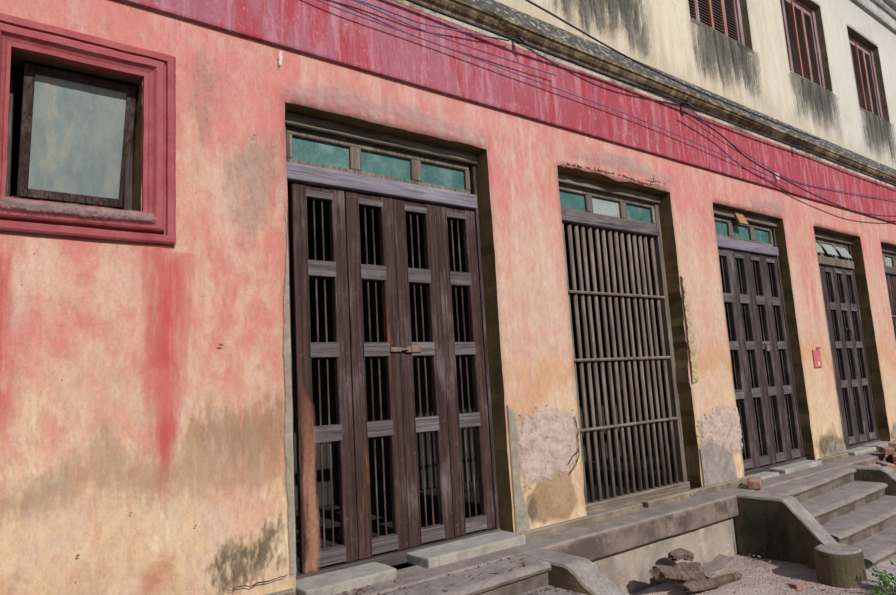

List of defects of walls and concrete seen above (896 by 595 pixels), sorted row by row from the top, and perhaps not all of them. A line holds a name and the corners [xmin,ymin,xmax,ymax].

damp [556,0,651,54]
damp [692,17,761,95]
damp [791,71,843,134]
damp [862,108,896,157]
flaking render [518,405,581,489]
flaking render [697,406,743,453]
damp [213,519,282,591]
crack [228,574,288,591]